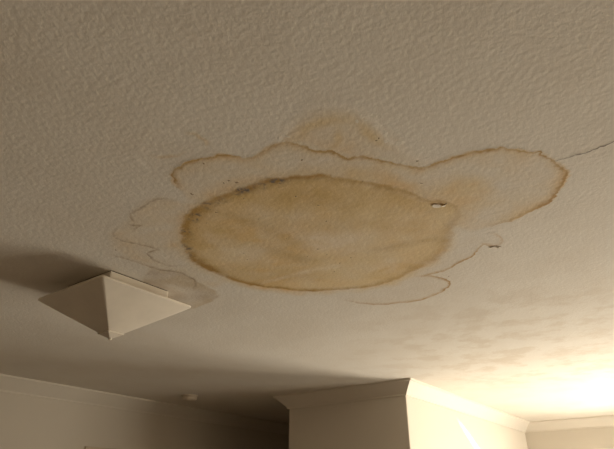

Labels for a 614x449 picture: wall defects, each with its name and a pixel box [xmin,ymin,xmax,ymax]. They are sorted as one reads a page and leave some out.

water stain [105,98,573,312]
crack [556,140,614,161]